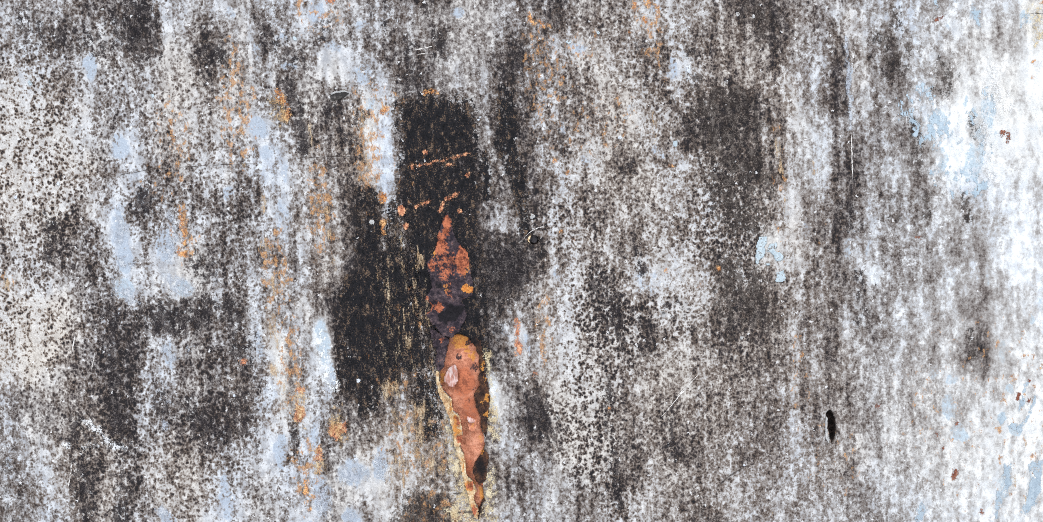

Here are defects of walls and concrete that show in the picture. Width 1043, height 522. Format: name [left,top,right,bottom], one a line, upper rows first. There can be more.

water stain [189,37,229,67]
water stain [326,101,370,160]
corrosion [398,192,458,250]
water stain [334,28,540,442]
water stain [633,243,648,278]
water stain [676,48,786,347]
water stain [61,294,134,522]
water stain [136,248,264,450]
corrosion [378,380,497,522]
corrosion [482,350,503,440]
water stain [585,261,689,365]